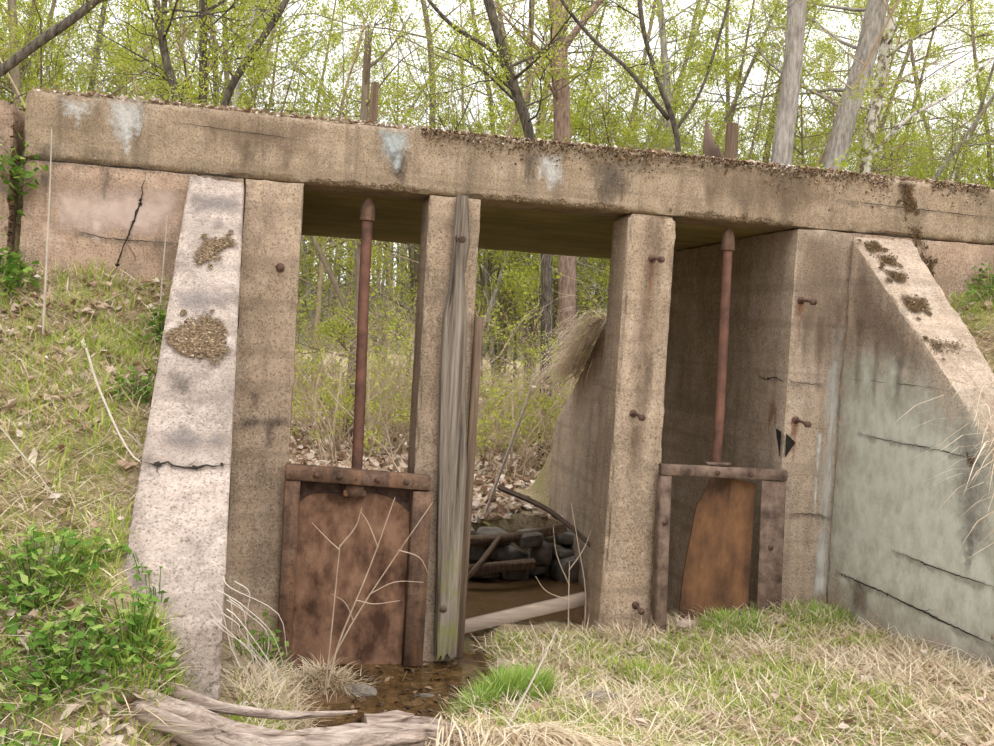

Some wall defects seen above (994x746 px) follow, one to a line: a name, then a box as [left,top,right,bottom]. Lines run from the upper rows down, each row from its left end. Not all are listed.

leakage [113,103,139,151]
crack [29,158,243,272]
crack [140,460,226,476]
crack [868,436,964,457]
crack [894,551,992,586]
crack [837,572,994,646]